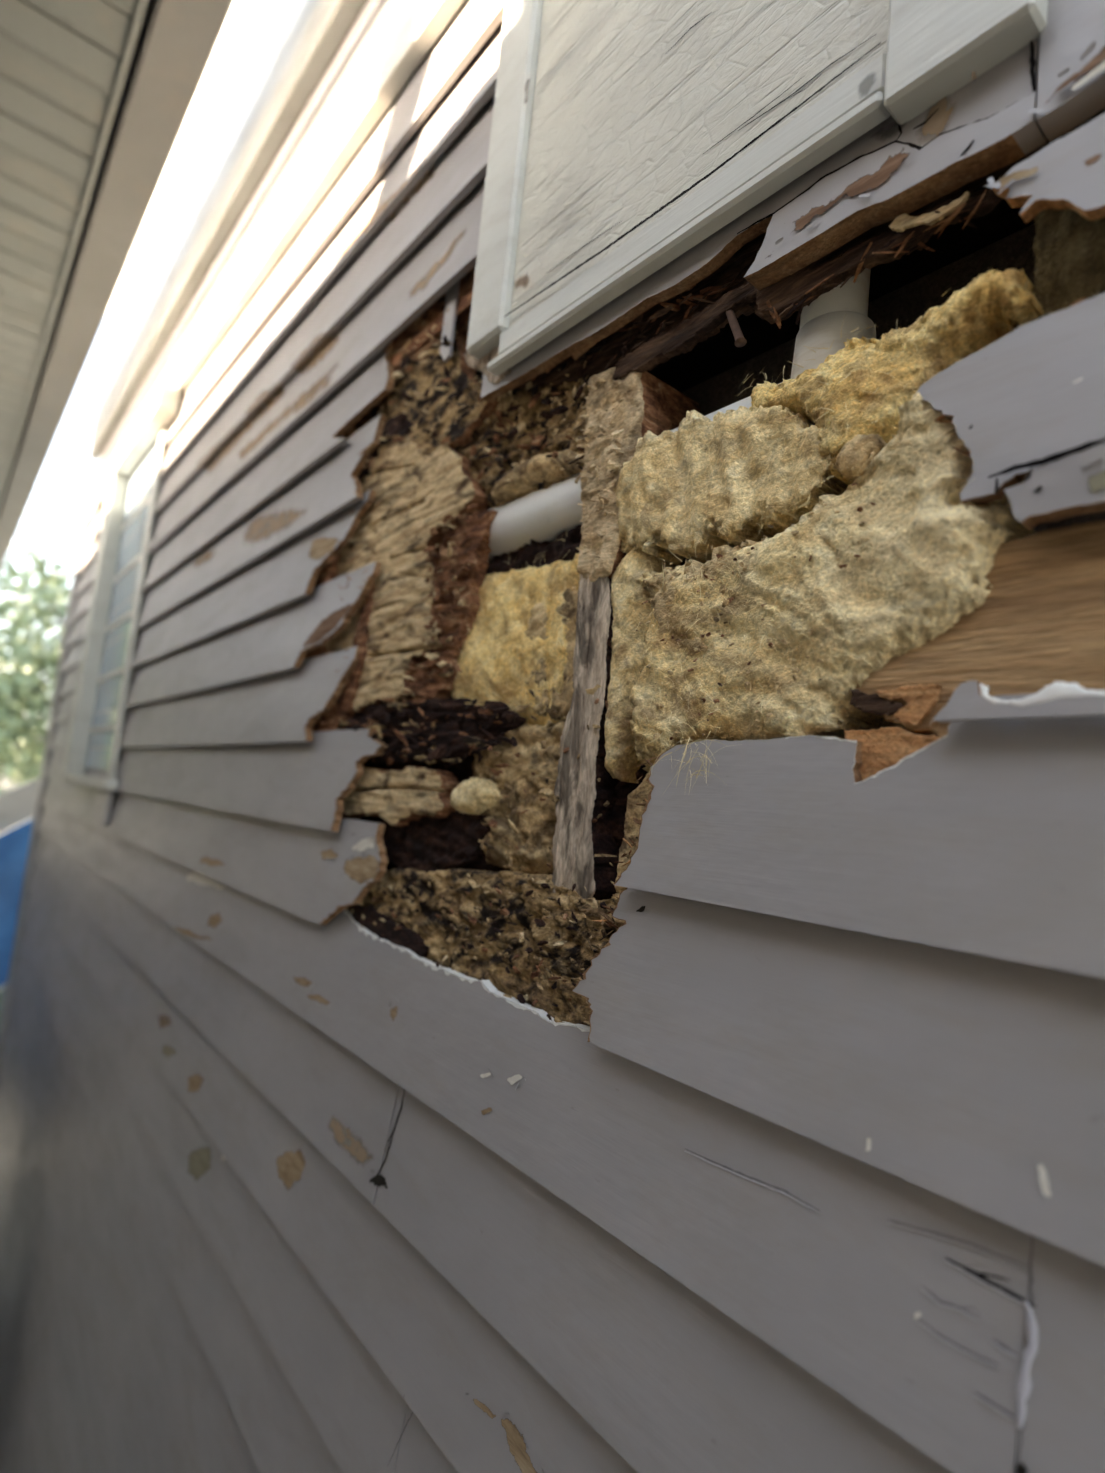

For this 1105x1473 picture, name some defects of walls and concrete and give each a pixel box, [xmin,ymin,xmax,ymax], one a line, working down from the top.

peeling [768,149,911,257]
peeling [302,603,353,649]
peeling [980,681,1105,707]
peeling [321,834,380,884]
peeling [276,1147,305,1190]
crack [377,1089,405,1175]
crack [945,1235,1036,1346]
peeling [465,1393,545,1473]